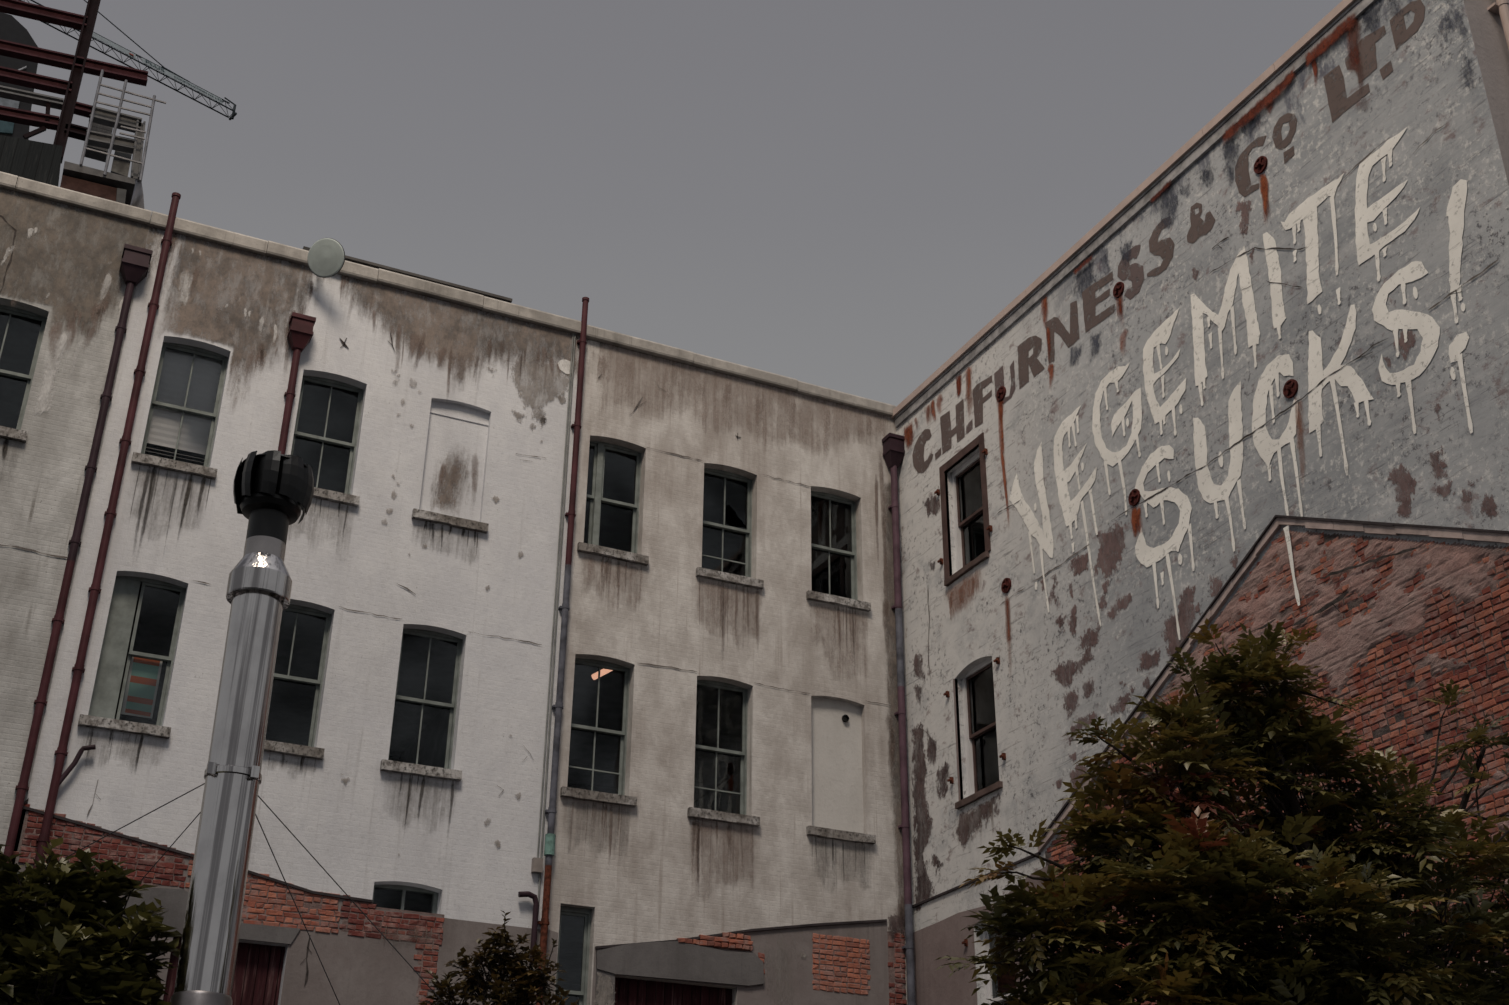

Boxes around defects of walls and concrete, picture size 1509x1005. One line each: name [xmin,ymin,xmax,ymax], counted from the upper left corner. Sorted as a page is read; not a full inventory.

rust [1260,175,1269,214]
leakage [0,188,313,412]
leakage [341,275,580,385]
leakage [436,459,476,509]
rust [997,400,1008,517]
rust [1131,508,1140,533]
peeling [913,651,926,703]
spalling [1038,446,1509,961]
flaking render [13,804,194,888]
leakage [400,775,425,817]
flaking render [812,722,949,1005]
flaking render [241,873,445,1005]